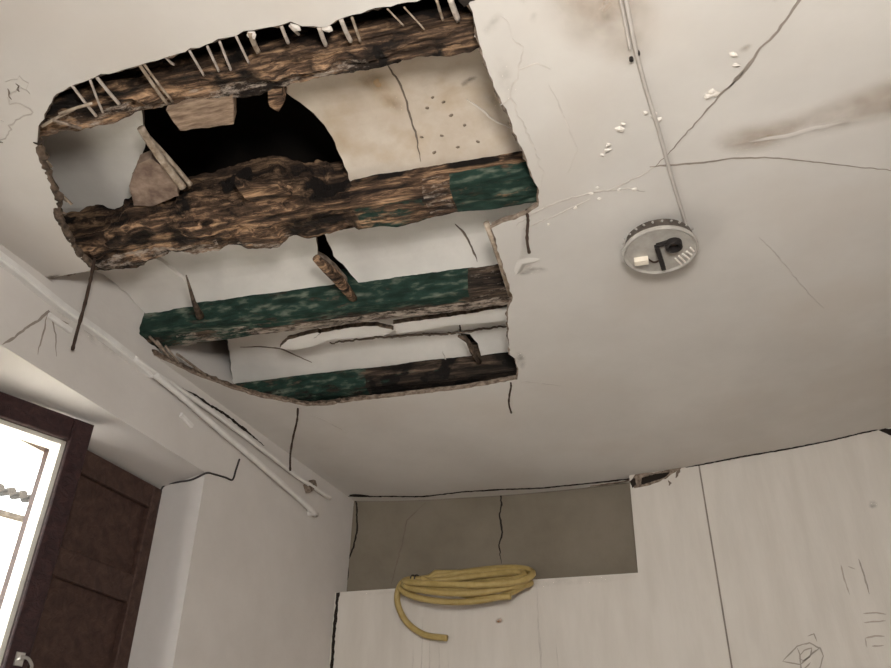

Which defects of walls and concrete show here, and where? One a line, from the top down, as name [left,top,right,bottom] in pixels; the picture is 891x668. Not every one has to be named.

peeling [0,76,33,143]
flaking render [33,74,121,270]
flaking render [118,0,539,405]
crack [388,0,891,229]
crack [686,430,876,468]
crack [330,478,630,668]